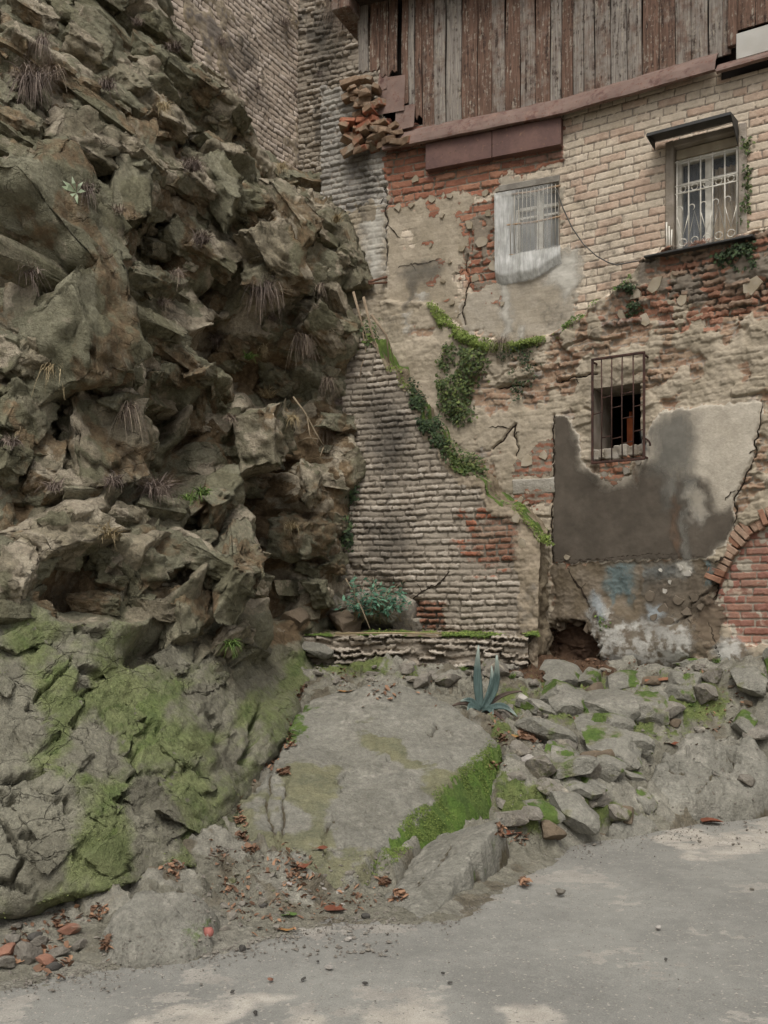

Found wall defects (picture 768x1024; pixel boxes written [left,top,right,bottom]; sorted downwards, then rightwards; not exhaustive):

crack [380,187,471,325]
spalling [380,144,564,307]
spalling [611,231,768,326]
crack [488,424,520,456]
spalling [475,439,555,563]
crack [550,403,763,661]